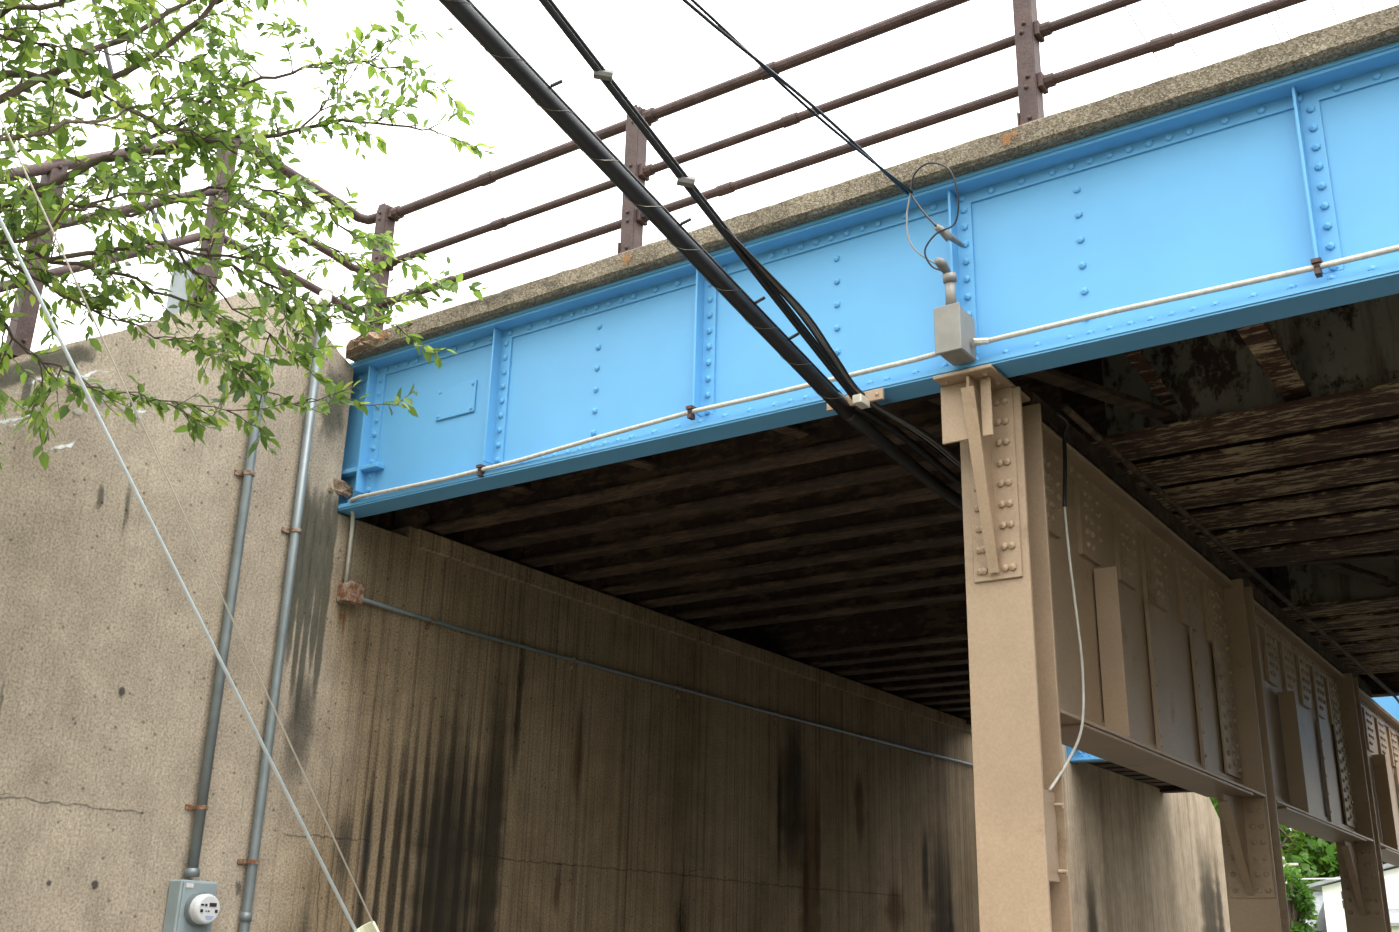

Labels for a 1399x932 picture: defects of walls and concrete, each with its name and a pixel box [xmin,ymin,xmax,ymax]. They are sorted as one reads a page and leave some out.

damp [778,738,808,932]
damp [923,842,954,932]